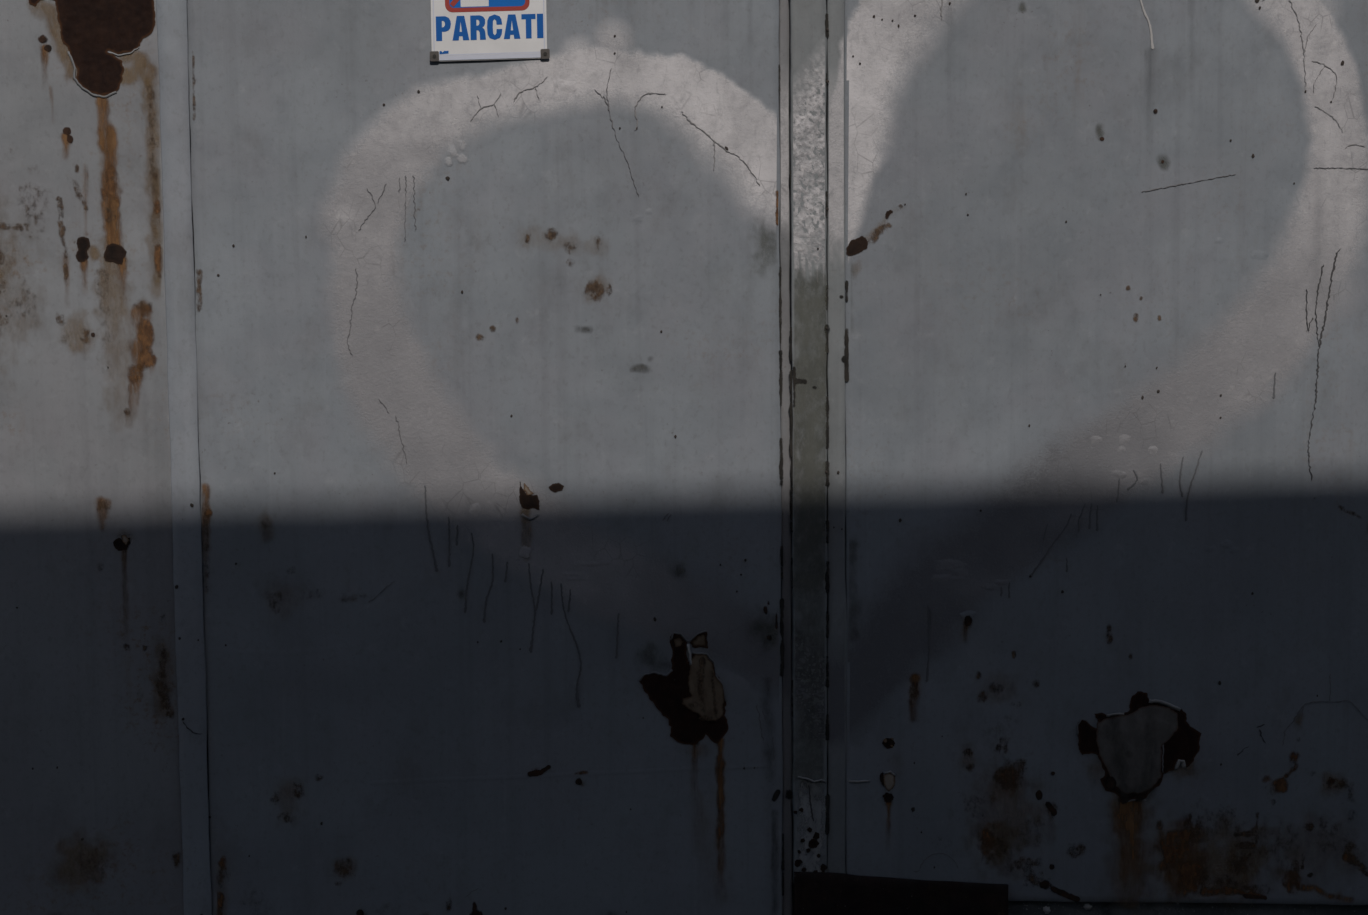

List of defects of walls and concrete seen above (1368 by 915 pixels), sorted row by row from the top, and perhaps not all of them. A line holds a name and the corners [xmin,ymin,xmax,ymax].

peeling [29,0,155,150]
rust [56,127,126,280]
rust [153,173,162,276]
rust [128,301,156,393]
peeling [682,634,725,721]
rust [715,738,726,868]